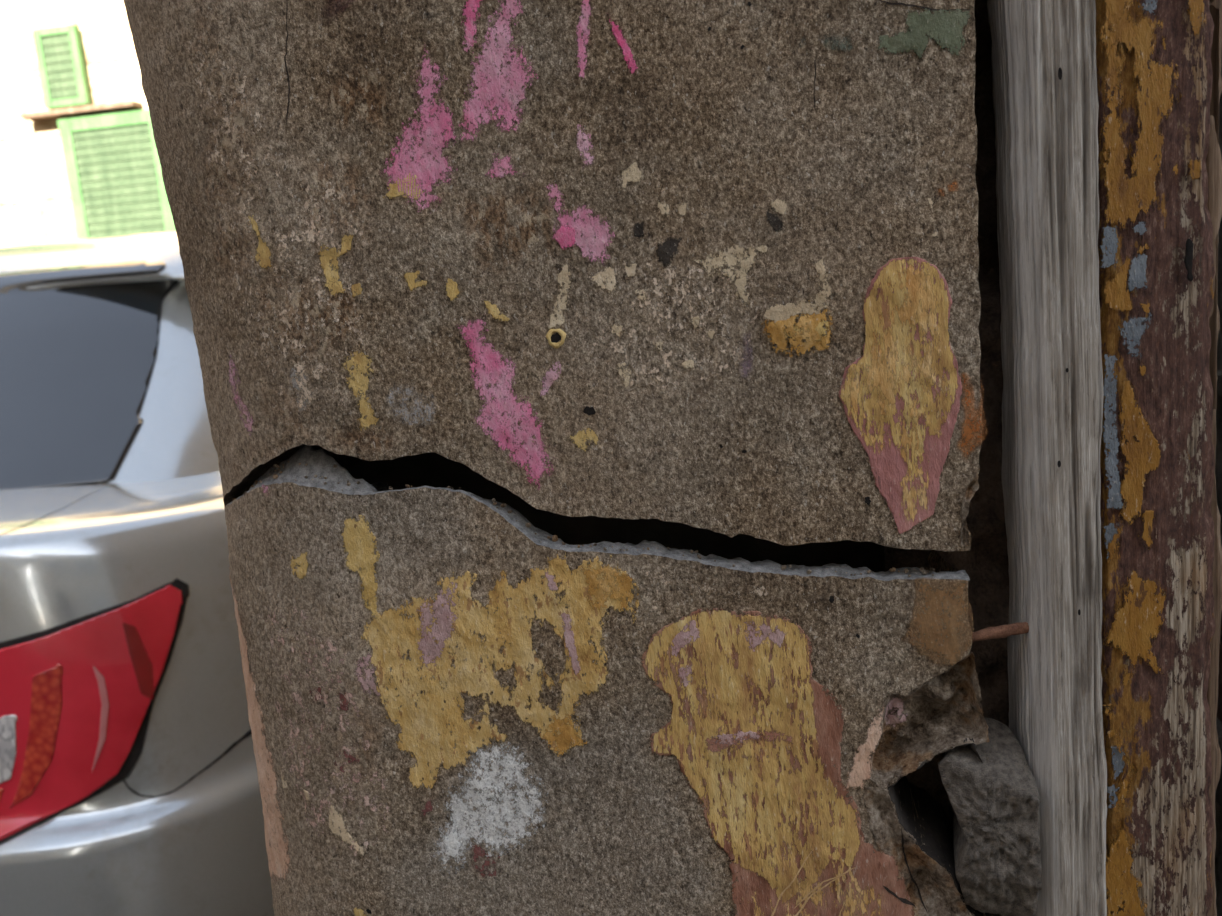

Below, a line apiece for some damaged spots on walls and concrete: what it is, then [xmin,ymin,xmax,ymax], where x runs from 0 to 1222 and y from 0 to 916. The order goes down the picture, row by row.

crack [223,444,970,581]
peeling [230,515,994,916]